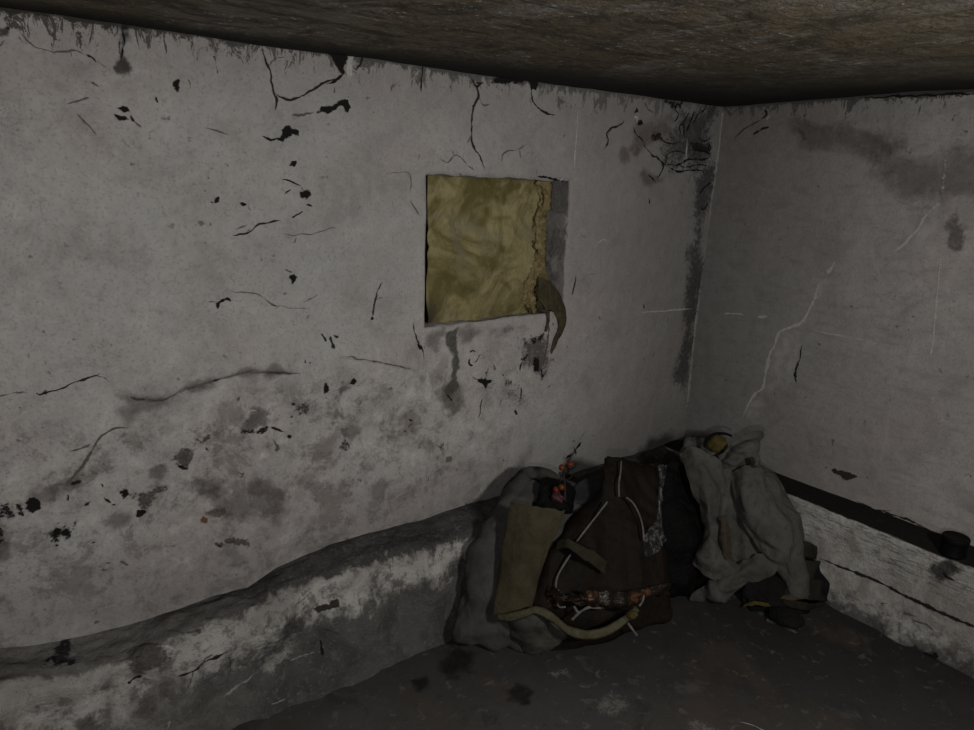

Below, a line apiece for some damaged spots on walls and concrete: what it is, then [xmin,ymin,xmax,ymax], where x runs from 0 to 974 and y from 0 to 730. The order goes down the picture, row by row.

crack [263,53,334,110]
flaking render [263,54,353,142]
crack [442,79,523,170]
crack [529,81,554,115]
damp [634,99,712,183]
crack [234,220,330,241]
flaking render [547,182,568,280]
crack [1,374,106,396]
damp [445,329,523,415]
damp [520,325,550,377]
crack [69,427,125,482]
crack [820,558,974,630]